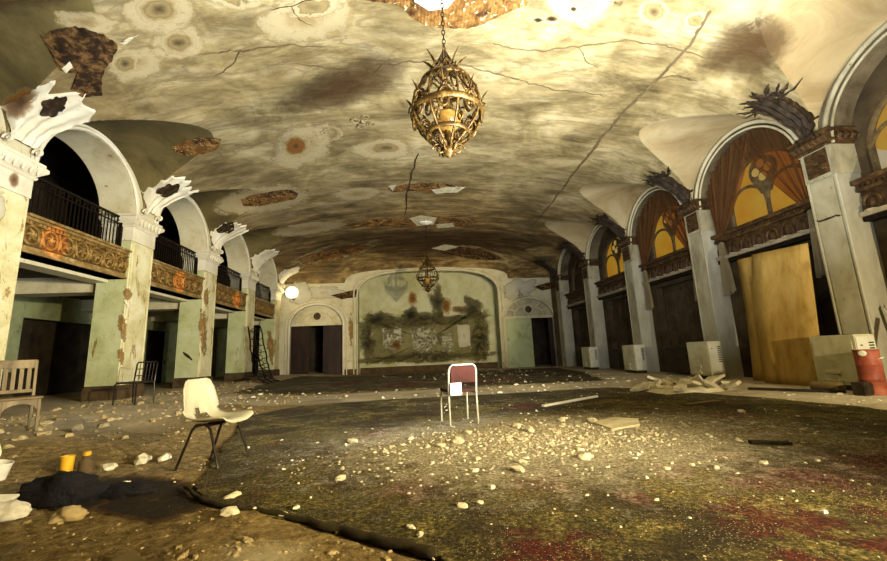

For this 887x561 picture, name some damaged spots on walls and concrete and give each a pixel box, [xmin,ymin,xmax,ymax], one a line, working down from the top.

damp [54,0,205,83]
damp [211,0,352,43]
crack [273,0,310,25]
spalling [365,0,529,29]
damp [535,0,621,29]
spalling [40,26,138,117]
crack [198,43,433,86]
crack [456,64,605,97]
crack [495,11,711,230]
spalling [241,189,298,206]
peeling [117,286,132,365]
damp [347,284,500,364]